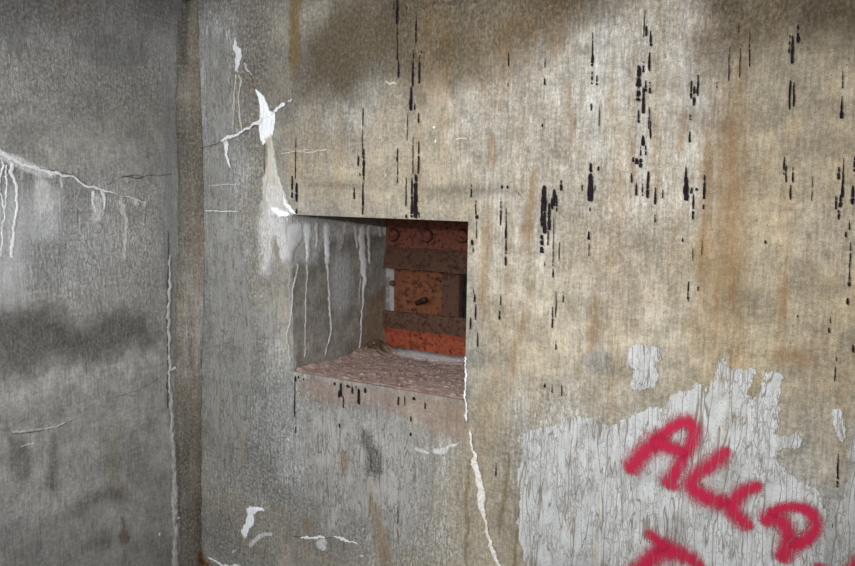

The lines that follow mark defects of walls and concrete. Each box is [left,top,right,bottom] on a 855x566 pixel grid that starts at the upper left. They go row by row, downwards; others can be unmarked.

damp [0,149,146,297]
crack [203,99,292,168]
damp [232,38,386,433]
damp [311,0,590,132]
damp [539,180,562,278]
damp [689,75,699,120]
damp [683,167,705,219]
crack [166,233,180,566]
spalling [241,506,272,547]
crack [463,357,501,566]
peeling [627,343,661,391]
peeling [516,358,855,566]